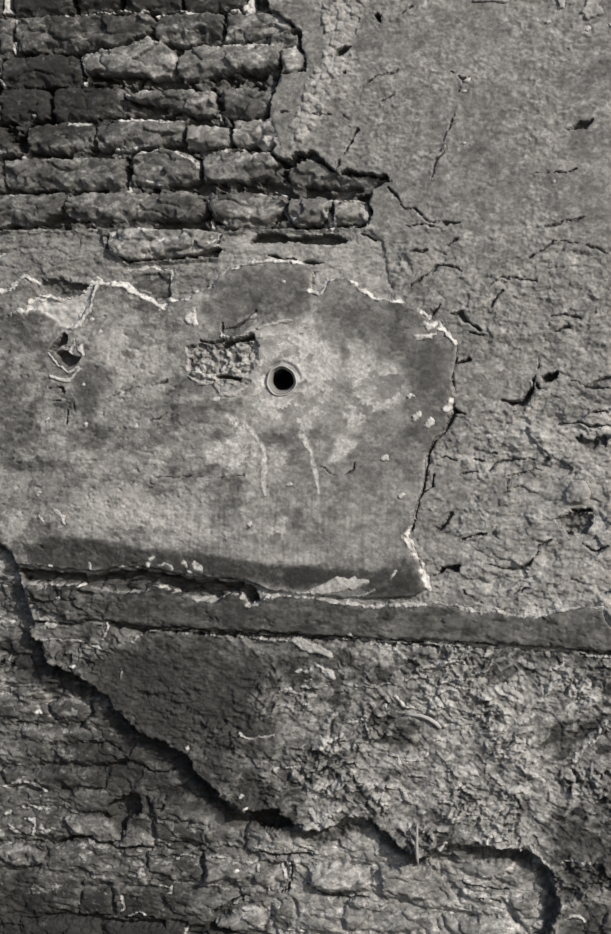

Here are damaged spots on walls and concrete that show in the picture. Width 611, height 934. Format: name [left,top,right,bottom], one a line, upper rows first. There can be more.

peeling [581,0,611,29]
spalling [0,0,392,302]
crack [387,186,462,287]
crack [490,217,610,308]
leakage [97,328,172,405]
spalling [184,314,293,398]
leakage [204,414,287,496]
leakage [247,307,403,494]
crack [410,345,552,542]
crack [558,376,611,429]
leakage [25,494,420,598]
spalling [0,545,588,934]